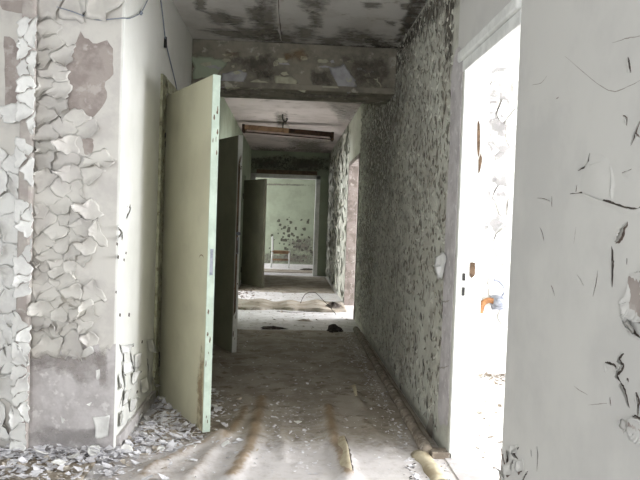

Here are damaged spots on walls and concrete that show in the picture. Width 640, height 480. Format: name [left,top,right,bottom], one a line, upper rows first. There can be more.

water stain [196,0,456,88]
crack [566,57,637,92]
water stain [251,140,330,171]
crack [623,115,640,145]
peeling [0,0,168,458]
water stain [265,239,313,263]
peeling [325,122,351,302]
peeling [354,0,463,438]
crack [570,154,640,296]
flaking render [618,271,640,335]
crack [574,351,640,416]
peeling [496,444,524,480]